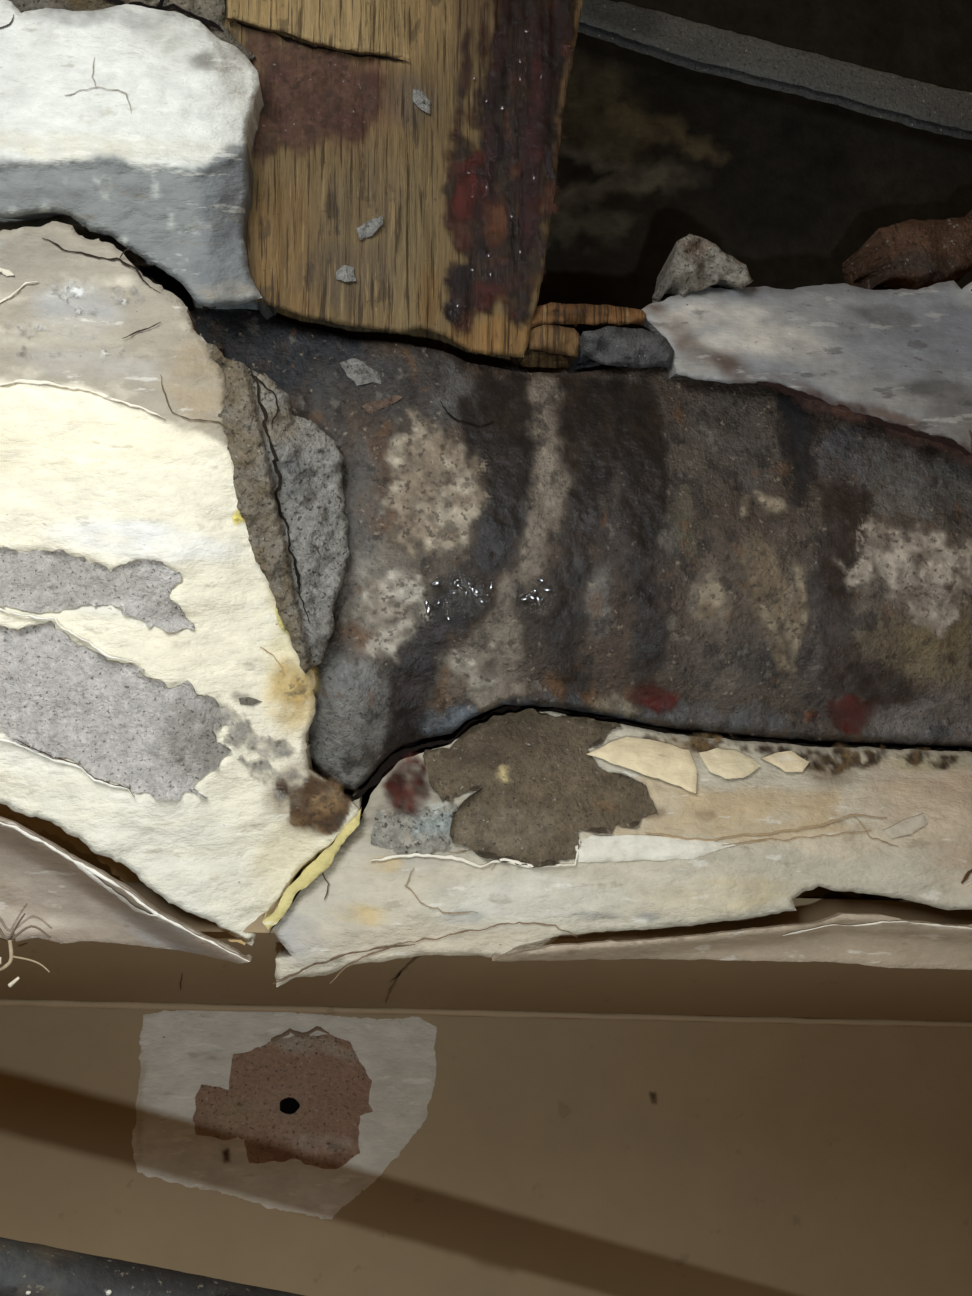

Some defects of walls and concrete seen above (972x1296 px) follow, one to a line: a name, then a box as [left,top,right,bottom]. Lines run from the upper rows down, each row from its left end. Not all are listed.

rust [442,0,576,332]
crack [245,359,321,623]
leakage [383,373,535,572]
leakage [741,395,972,702]
crack [0,804,142,882]
spalling [0,547,262,800]
leakage [351,570,495,745]
spalling [370,708,887,868]
crack [341,706,972,820]
leakage [744,744,885,775]
crack [796,886,904,901]
spalling [193,1027,373,1169]